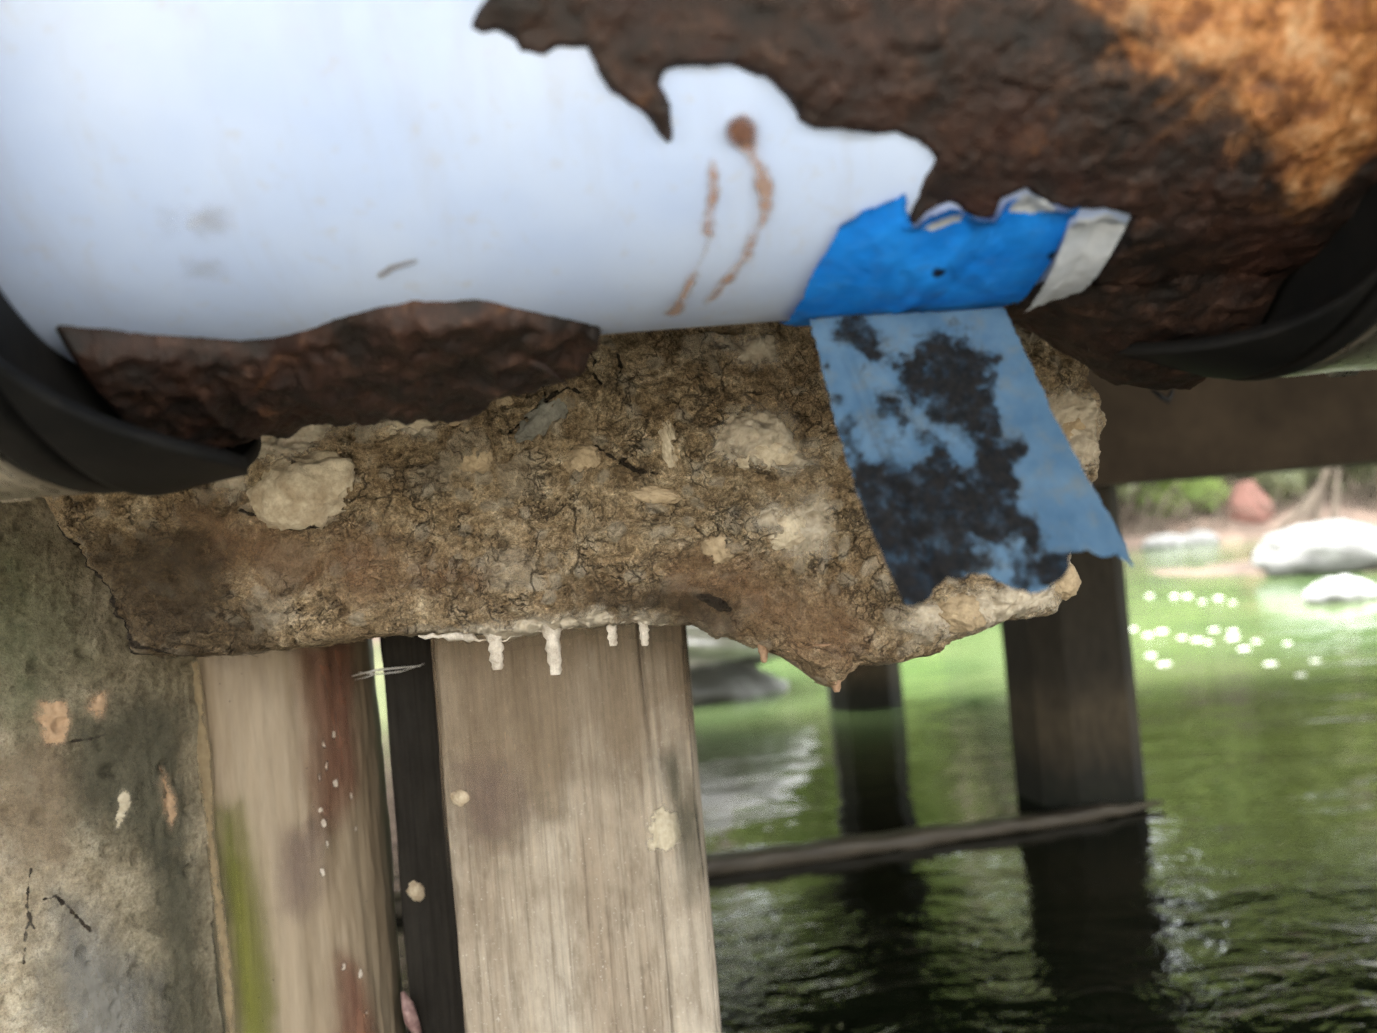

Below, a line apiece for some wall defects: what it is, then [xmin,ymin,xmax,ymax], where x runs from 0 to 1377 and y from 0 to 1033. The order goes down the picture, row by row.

rust [472,0,1377,300]
rust [665,273,696,316]
leakage [418,590,734,831]